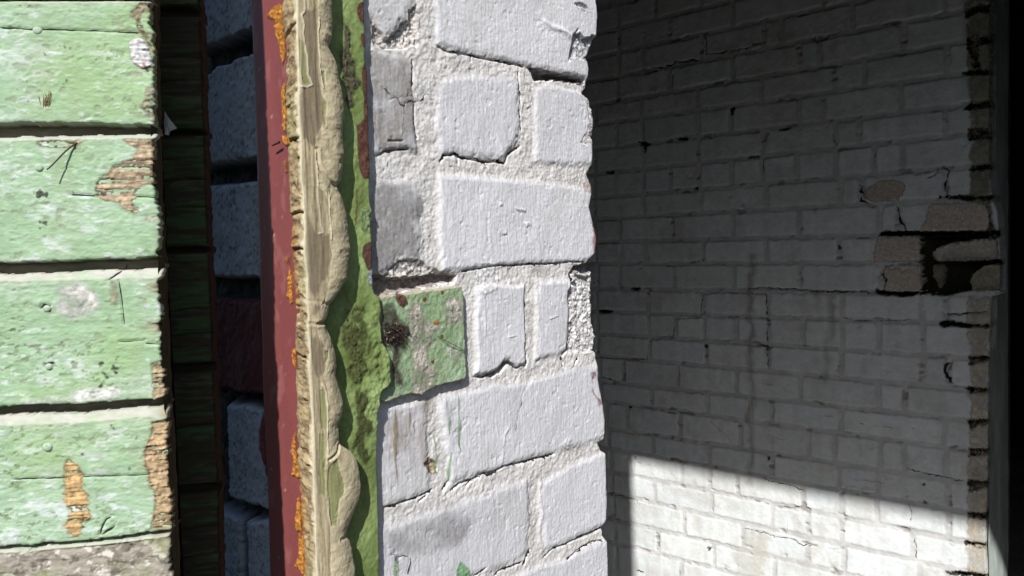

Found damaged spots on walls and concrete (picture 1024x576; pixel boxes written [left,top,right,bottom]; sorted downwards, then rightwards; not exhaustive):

peeling [129,38,153,68]
peeling [94,112,177,214]
spalling [874,202,1004,297]
peeling [151,361,168,398]
peeling [63,460,91,537]
peeling [142,420,180,529]